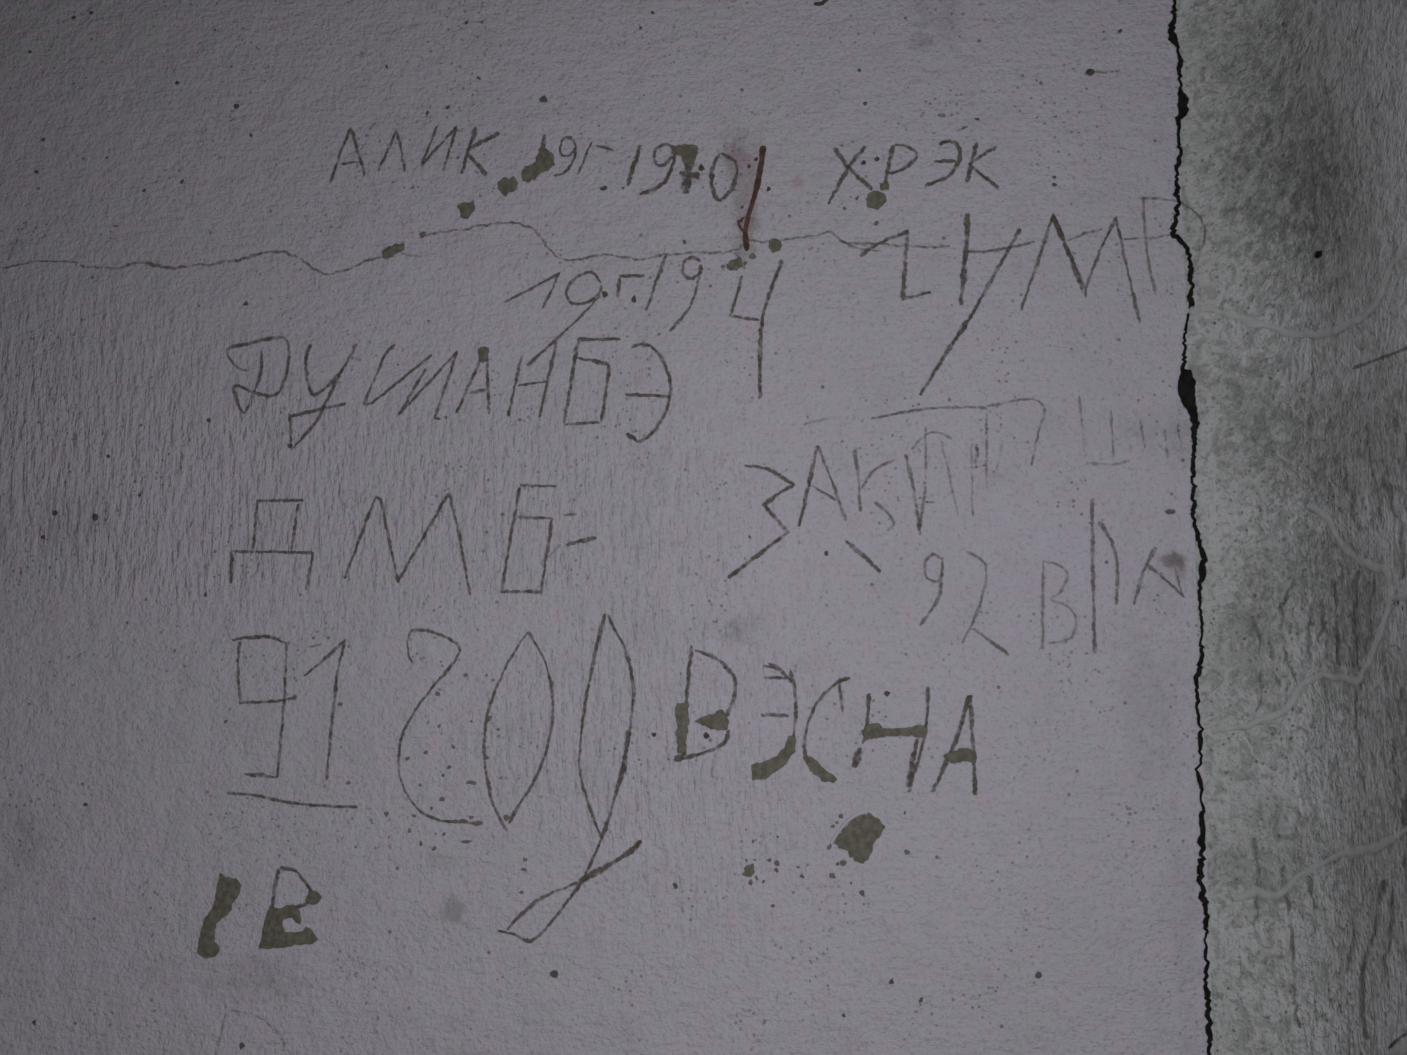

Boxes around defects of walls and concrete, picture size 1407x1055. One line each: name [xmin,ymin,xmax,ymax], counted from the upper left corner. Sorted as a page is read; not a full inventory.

crack [5,250,379,275]
crack [420,221,806,261]
crack [839,240,944,248]
crack [1168,0,1213,1055]